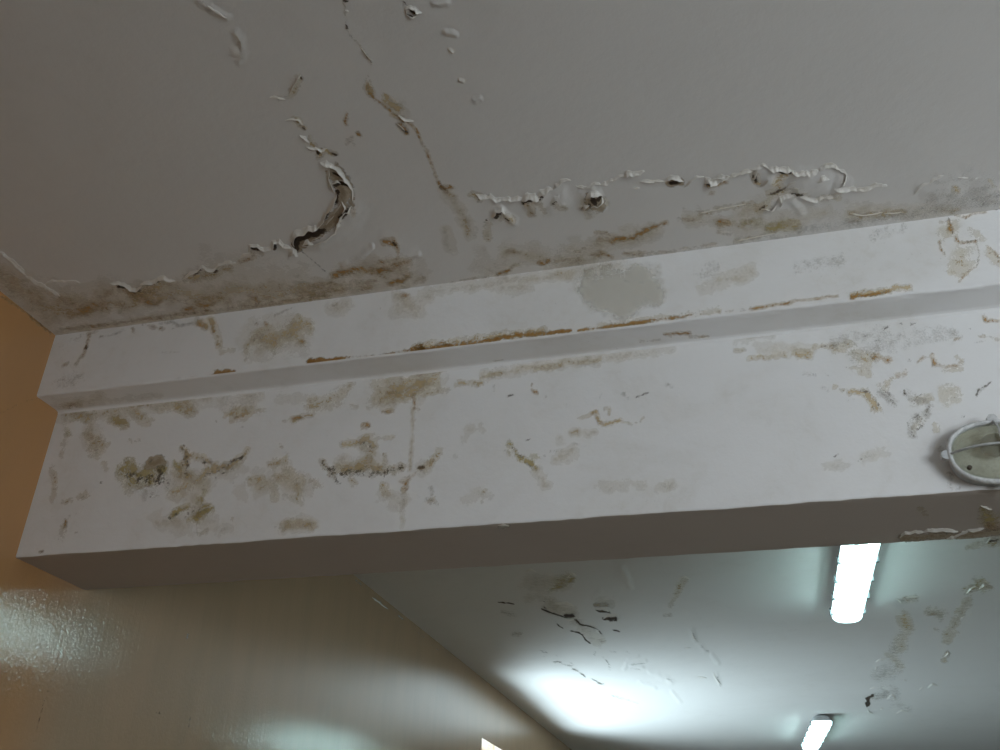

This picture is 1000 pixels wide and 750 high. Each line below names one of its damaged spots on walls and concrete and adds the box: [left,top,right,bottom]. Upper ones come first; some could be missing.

peeling [110,118,372,294]
water stain [311,227,423,297]
water stain [580,253,662,318]
water stain [606,222,667,243]
peeling [475,161,887,228]
water stain [119,445,247,492]
water stain [322,460,425,490]
water stain [168,497,214,521]
peeling [898,525,1000,546]
crack [542,601,622,700]